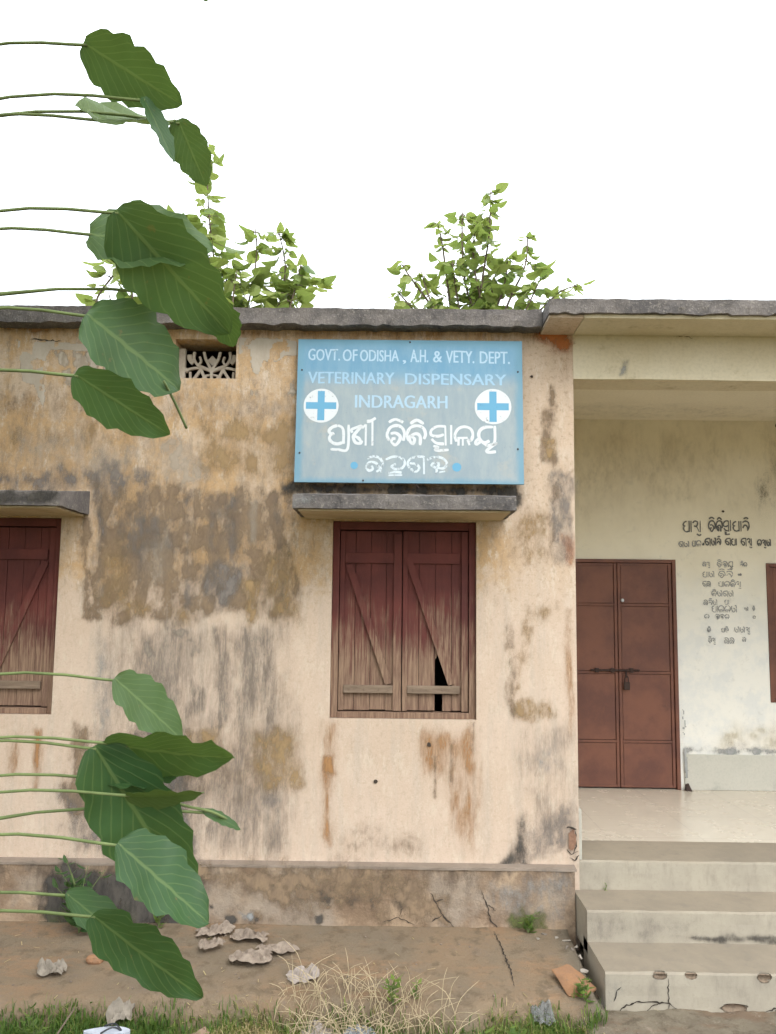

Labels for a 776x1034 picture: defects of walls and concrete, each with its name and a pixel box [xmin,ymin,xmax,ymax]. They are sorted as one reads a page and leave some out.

water stain [542,386,573,556]
water stain [0,463,522,688]
water stain [59,727,101,847]
water stain [164,776,189,825]
water stain [248,729,302,806]
corrosion [323,757,334,839]
corrosion [425,732,473,791]
water stain [38,862,178,923]
water stain [193,839,450,926]
crack [386,894,454,927]